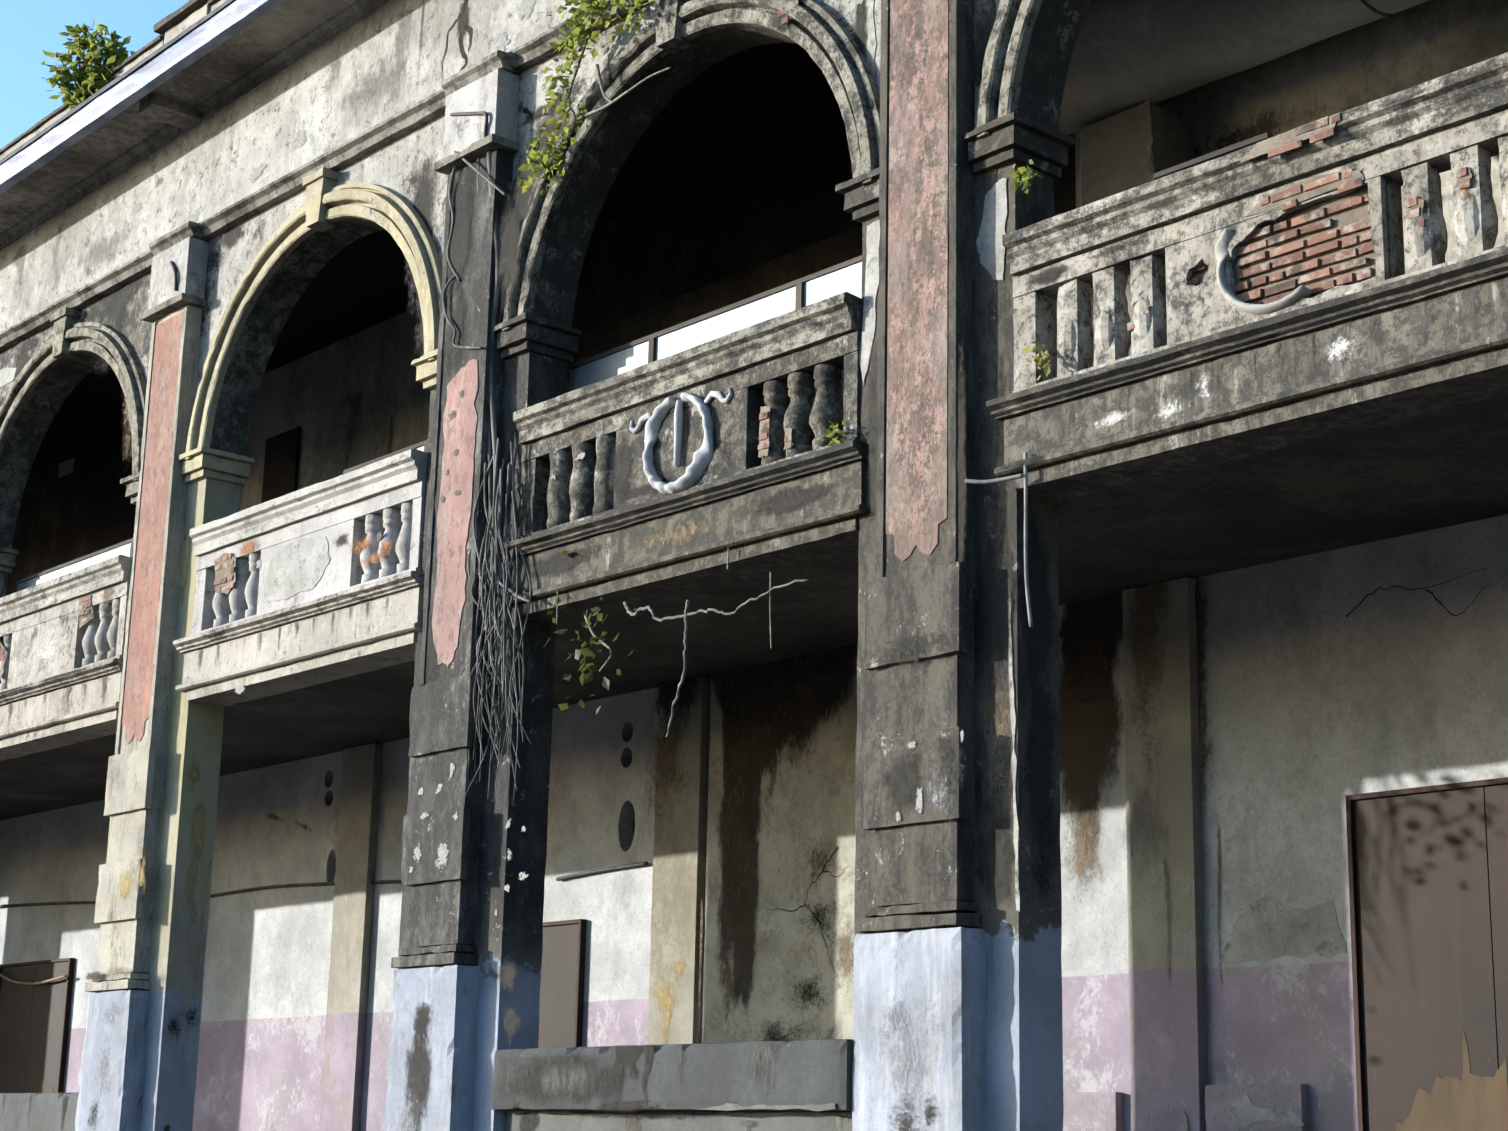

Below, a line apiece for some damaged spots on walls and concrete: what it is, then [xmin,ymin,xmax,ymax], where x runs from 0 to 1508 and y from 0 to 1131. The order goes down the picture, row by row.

flaking render [770,0,798,33]
flaking render [1240,112,1341,163]
peeling [976,177,1008,281]
flaking render [1233,169,1387,304]
flaking render [1407,196,1426,228]
leakage [1408,303,1431,343]
leakage [867,338,877,517]
leakage [957,348,1167,905]
crack [1346,568,1505,617]
leakage [648,644,858,1021]
leakage [884,754,924,810]
crack [763,847,849,977]